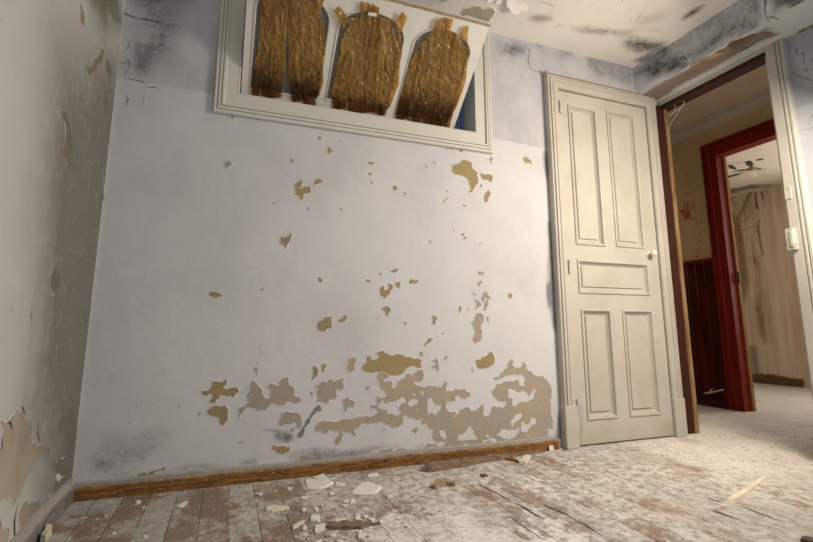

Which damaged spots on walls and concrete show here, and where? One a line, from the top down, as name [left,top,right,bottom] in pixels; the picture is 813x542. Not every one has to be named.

peeling [460,0,502,22]
damp [628,41,676,75]
peeling [445,148,493,203]
peeling [316,315,347,333]
peeling [376,268,418,320]
peeling [459,271,491,344]
peeling [198,338,554,451]
peeling [0,407,78,542]
peeling [271,443,291,455]